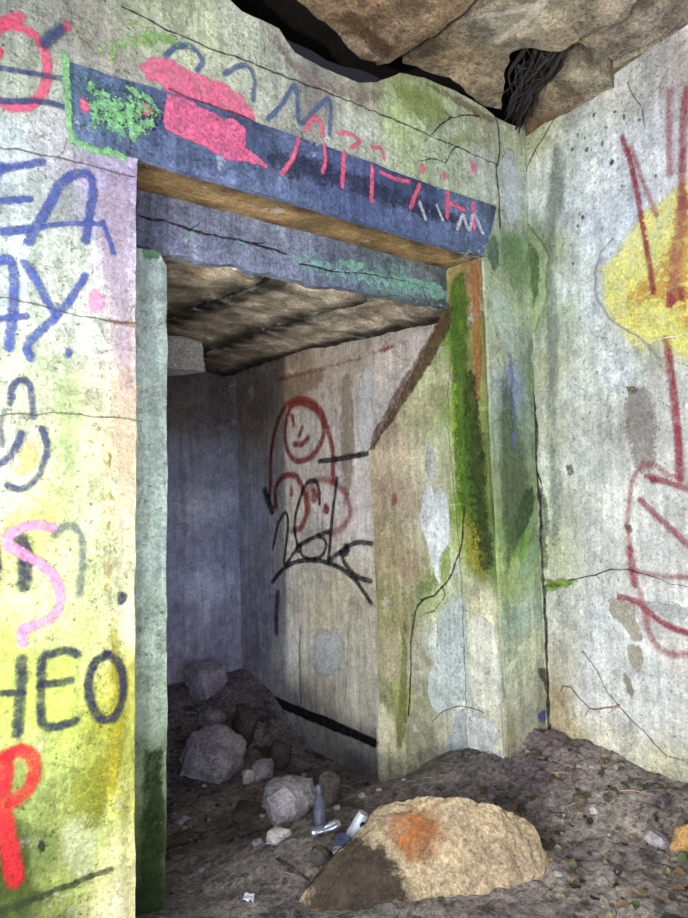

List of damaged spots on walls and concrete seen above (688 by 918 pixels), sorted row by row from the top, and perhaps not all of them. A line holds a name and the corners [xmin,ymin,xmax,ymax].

crack [121,6,556,229]
leakage [503,151,519,224]
leakage [533,149,564,250]
crack [408,381,484,738]
leakage [449,273,528,578]
leakage [537,272,559,568]
crack [533,386,688,763]